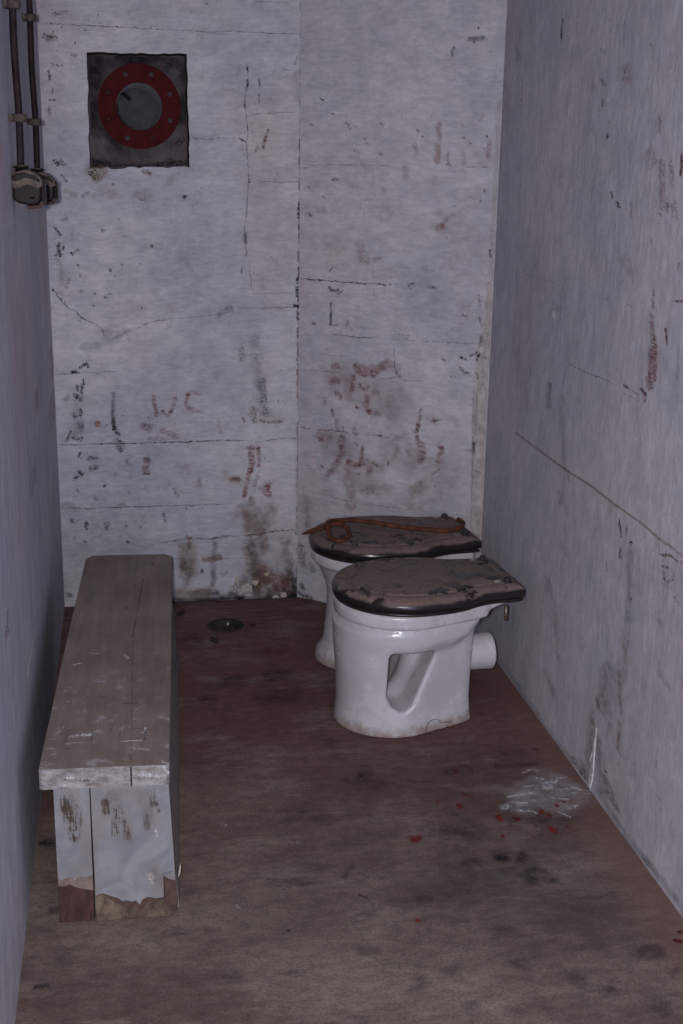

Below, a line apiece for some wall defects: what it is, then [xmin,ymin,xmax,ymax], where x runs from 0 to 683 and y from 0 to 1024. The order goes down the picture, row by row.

crack [239,67,384,380]